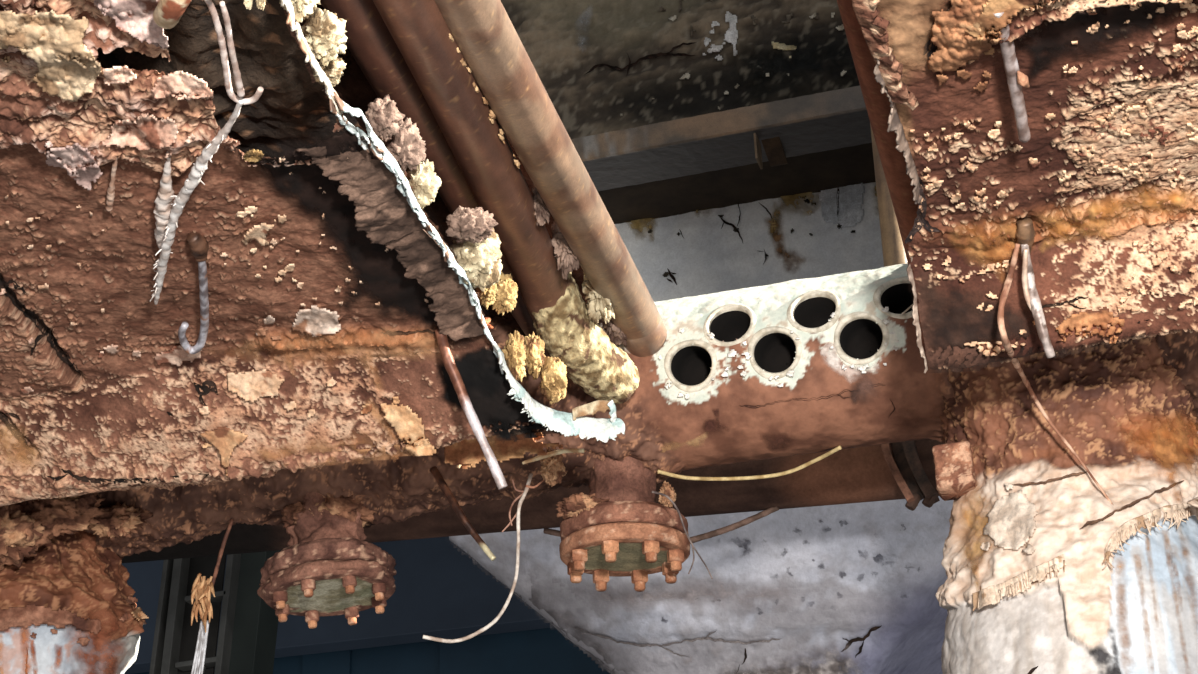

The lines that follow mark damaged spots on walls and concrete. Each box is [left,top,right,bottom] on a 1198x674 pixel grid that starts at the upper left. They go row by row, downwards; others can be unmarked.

crack [586,42,696,75]
peeling [1159,0,1198,72]
peeling [910,121,1002,152]
peeling [922,167,1009,210]
corrosion [1046,191,1185,244]
peeling [922,255,1010,283]
corrosion [970,226,1016,266]
crack [0,274,81,375]
crack [0,413,209,484]
corrosion [22,627,37,674]
corrosion [56,624,124,674]
crack [573,627,781,672]